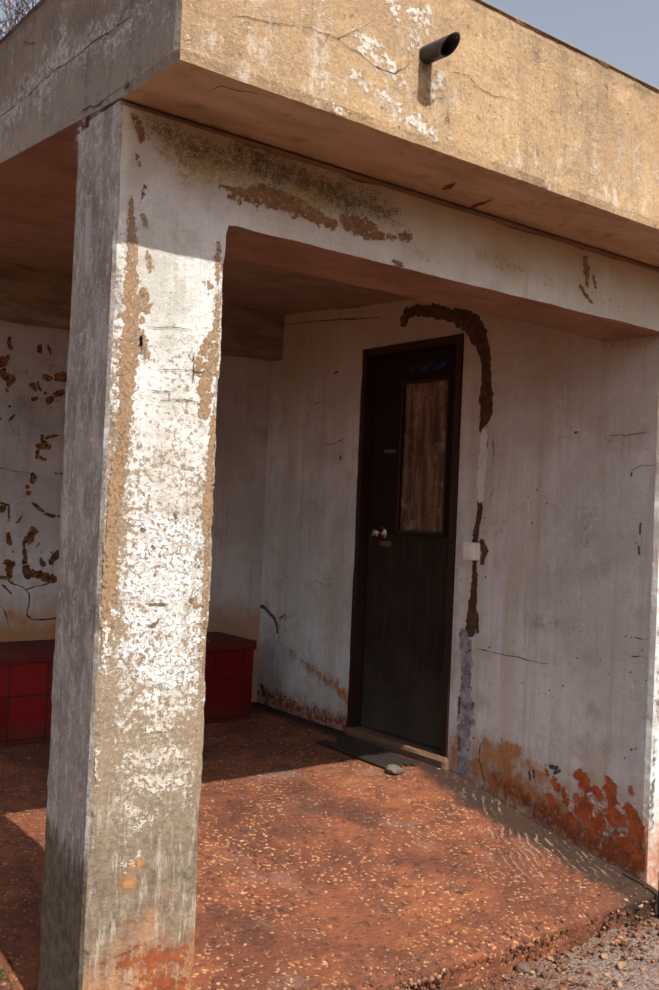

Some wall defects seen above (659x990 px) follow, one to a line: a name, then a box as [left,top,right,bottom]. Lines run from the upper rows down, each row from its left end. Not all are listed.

crack [1,0,150,116]
crack [239,16,412,74]
leakage [0,0,433,383]
peeling [219,183,412,243]
peeling [29,343,67,462]
peeling [100,195,224,704]
peeling [400,303,494,432]
crack [1,577,56,622]
peeling [0,502,59,594]
peeling [112,717,191,836]
leakage [448,722,659,879]
peeling [544,738,658,869]